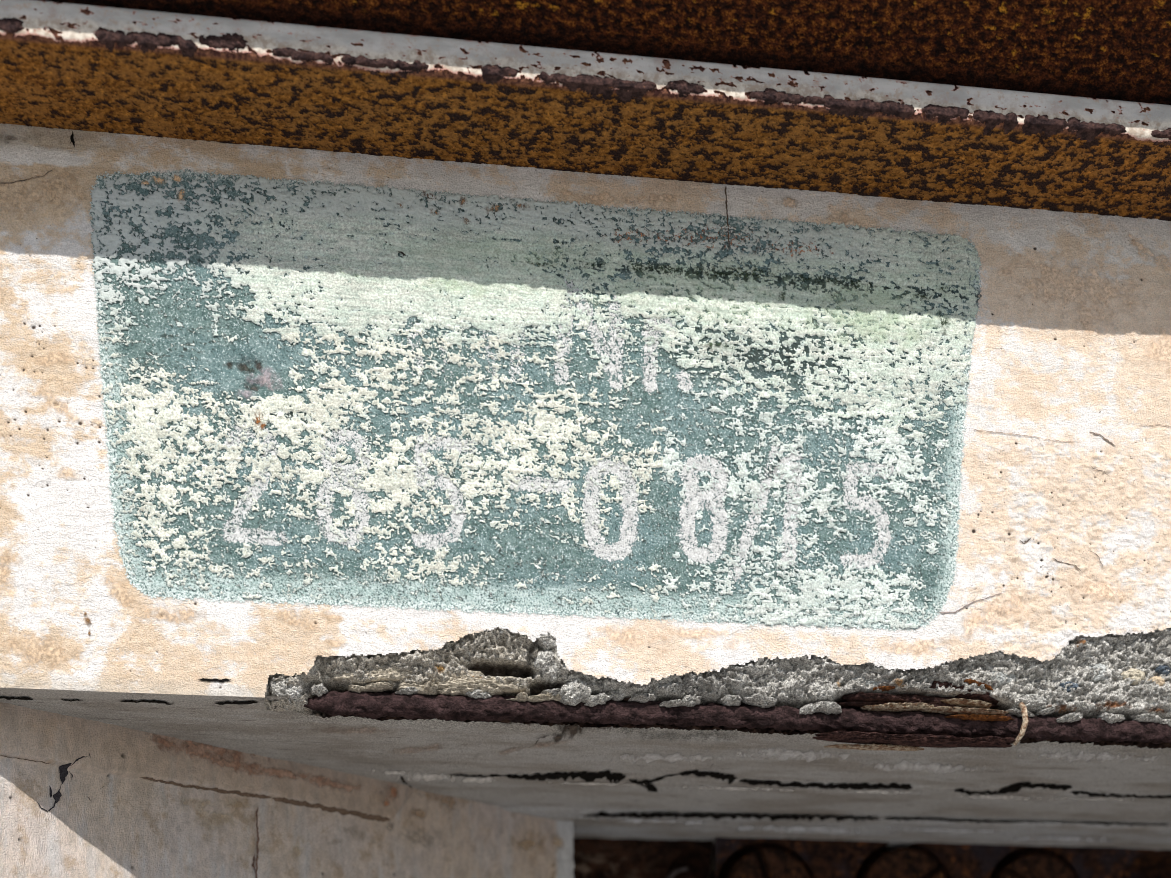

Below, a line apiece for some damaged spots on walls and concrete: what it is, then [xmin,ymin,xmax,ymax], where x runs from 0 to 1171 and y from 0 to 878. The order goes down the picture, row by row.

peeling [0,0,1171,142]
corrosion [749,88,1127,142]
peeling [90,172,981,654]
crack [1,754,104,812]
crack [139,777,390,878]
corrosion [536,724,608,743]
spalling [264,627,1171,773]
crack [451,763,1171,826]